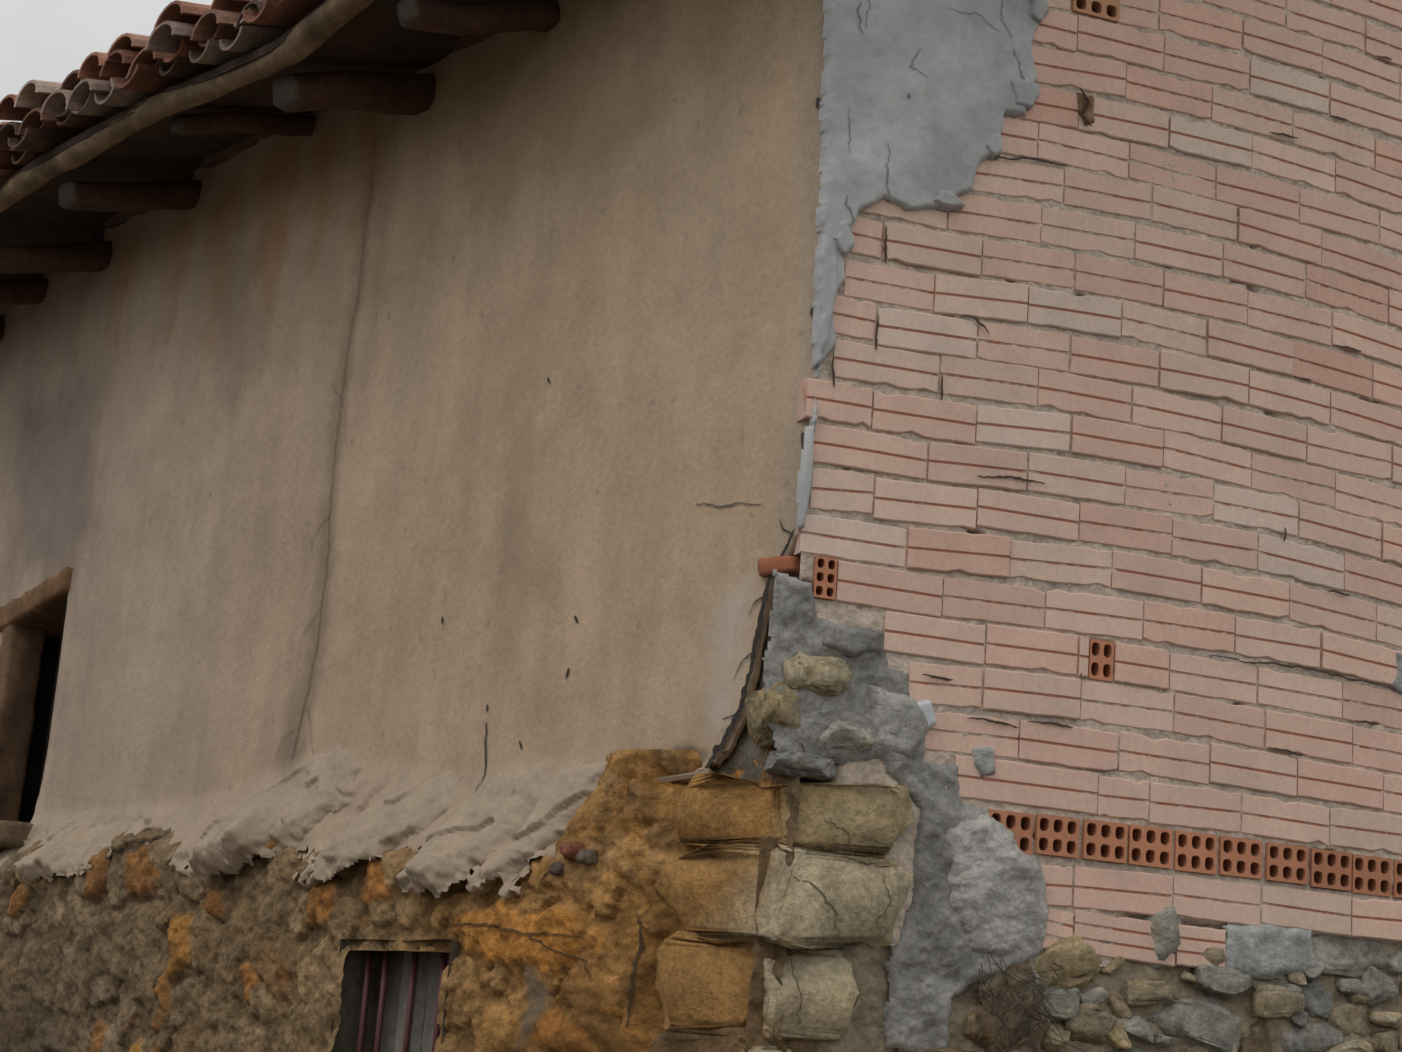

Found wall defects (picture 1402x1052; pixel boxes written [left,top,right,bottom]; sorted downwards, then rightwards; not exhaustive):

spalling [1076,88,1095,127]
flaking render [810,0,1050,379]
crack [696,500,761,508]
flaking render [704,398,817,781]
flaking render [549,841,598,876]
crack [785,820,894,933]
crack [450,922,592,981]